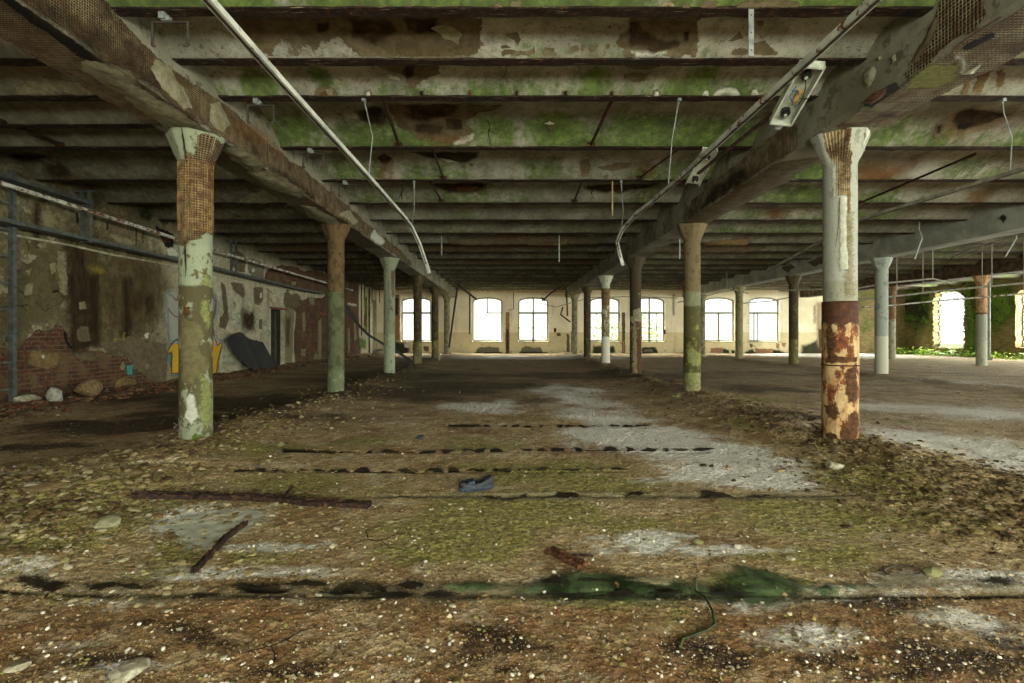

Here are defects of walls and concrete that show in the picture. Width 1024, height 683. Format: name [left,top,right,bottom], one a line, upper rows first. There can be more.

peeling [736,0,800,26]
spalling [233,3,484,89]
peeling [501,32,555,56]
spalling [570,0,717,82]
spalling [963,33,995,51]
flaking render [14,77,96,95]
peeling [962,64,1005,94]
leakage [357,106,385,125]
flaking render [0,241,327,440]
corrosion [631,308,642,373]
corrosion [801,322,859,440]